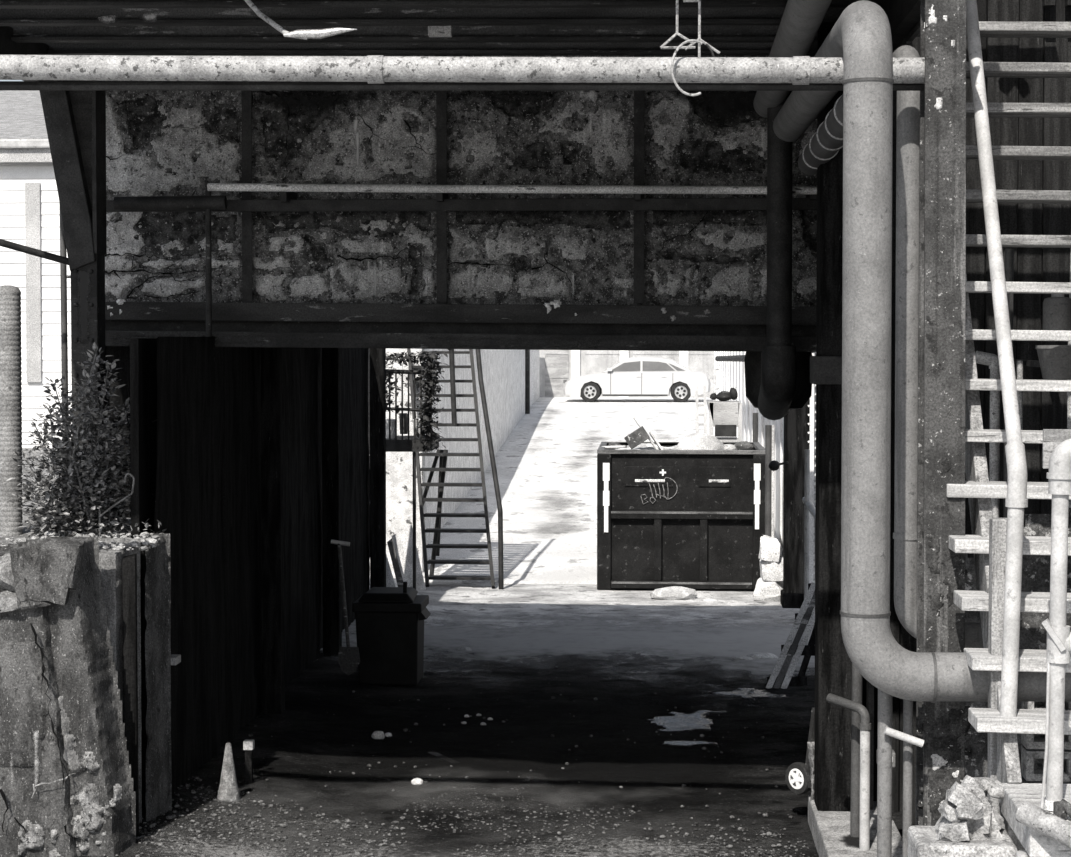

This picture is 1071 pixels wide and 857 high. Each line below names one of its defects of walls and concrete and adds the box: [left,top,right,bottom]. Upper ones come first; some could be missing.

water stain [455,91,554,104]
crack [0,623,75,845]
spalling [18,820,63,857]
spalling [58,696,122,853]